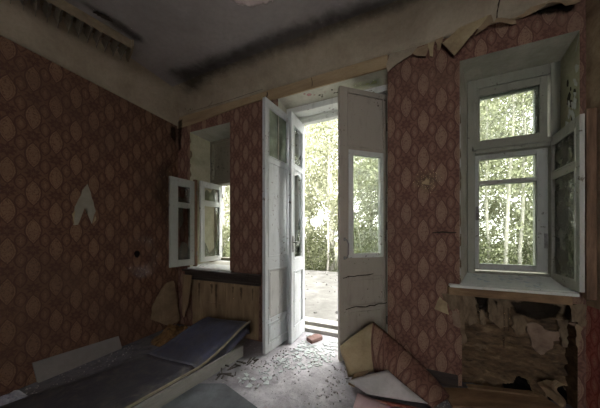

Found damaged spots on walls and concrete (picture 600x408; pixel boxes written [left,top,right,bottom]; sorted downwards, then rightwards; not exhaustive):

peeling [475,0,581,35]
leakage [174,0,408,88]
peeling [386,41,435,72]
peeling [72,184,96,225]
spalling [441,293,587,405]